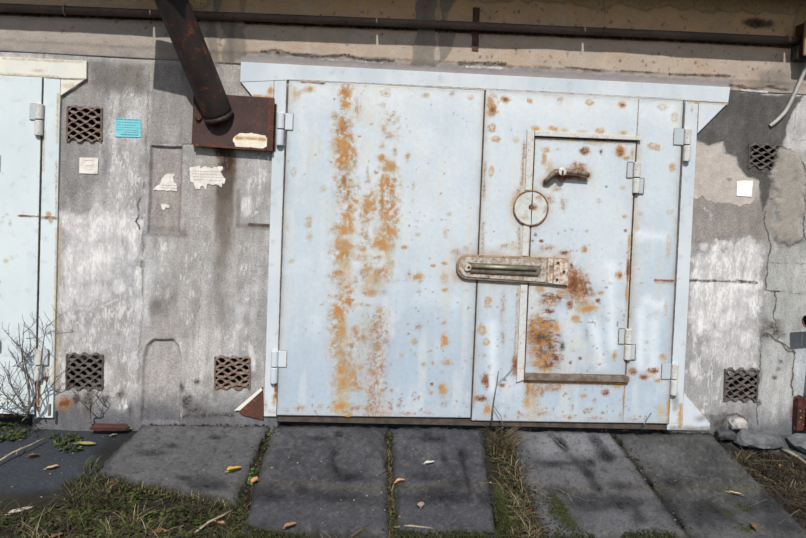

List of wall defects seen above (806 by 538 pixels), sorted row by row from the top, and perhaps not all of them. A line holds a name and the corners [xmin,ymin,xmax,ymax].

water stain [207,22,246,65]
water stain [411,0,455,66]
water stain [523,0,806,32]
corrosion [254,87,277,152]
corrosion [486,93,509,142]
peeling [693,142,760,220]
crack [777,146,806,245]
corrosion [325,84,413,417]
corrosion [615,229,631,300]
corrosion [500,264,660,419]
crack [724,211,803,428]
corrosion [473,365,491,415]